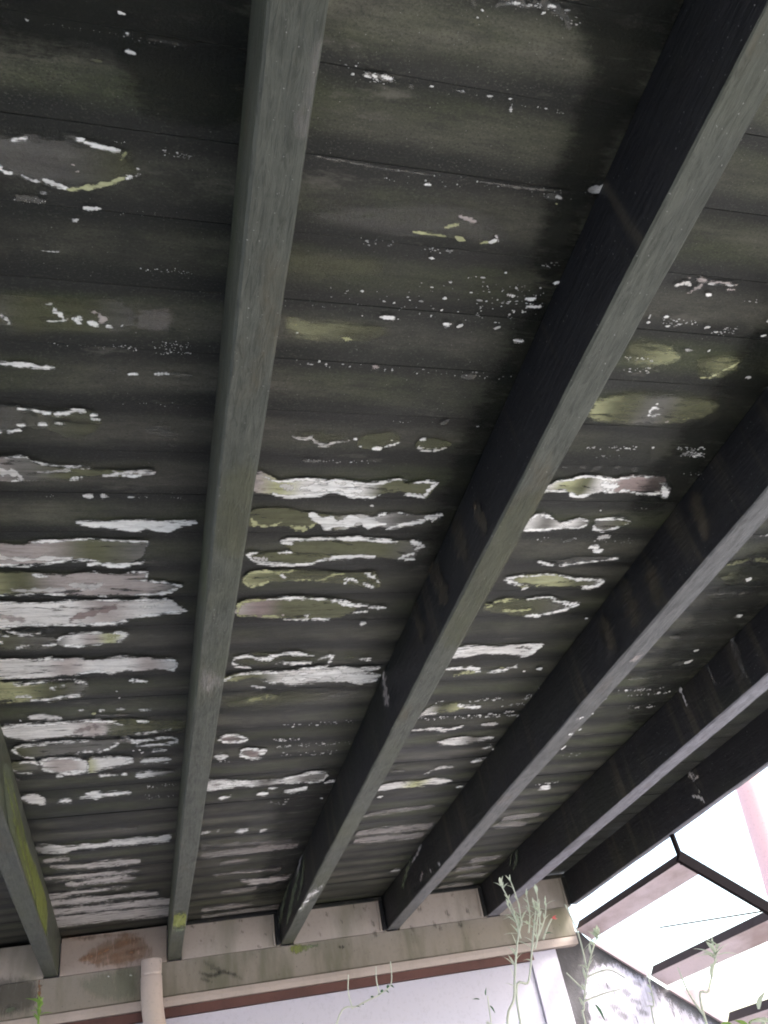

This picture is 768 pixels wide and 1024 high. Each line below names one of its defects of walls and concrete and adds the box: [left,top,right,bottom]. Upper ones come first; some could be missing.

water stain [0,0,252,129]
water stain [428,0,680,565]
water stain [634,330,768,514]
peeling [545,475,669,509]
peeling [235,471,443,625]
peeling [484,510,631,618]
peeling [0,519,197,805]
peeling [224,651,381,689]
peeling [446,644,544,677]
peeling [412,694,532,763]
peeling [207,771,335,805]
peeling [35,834,172,927]